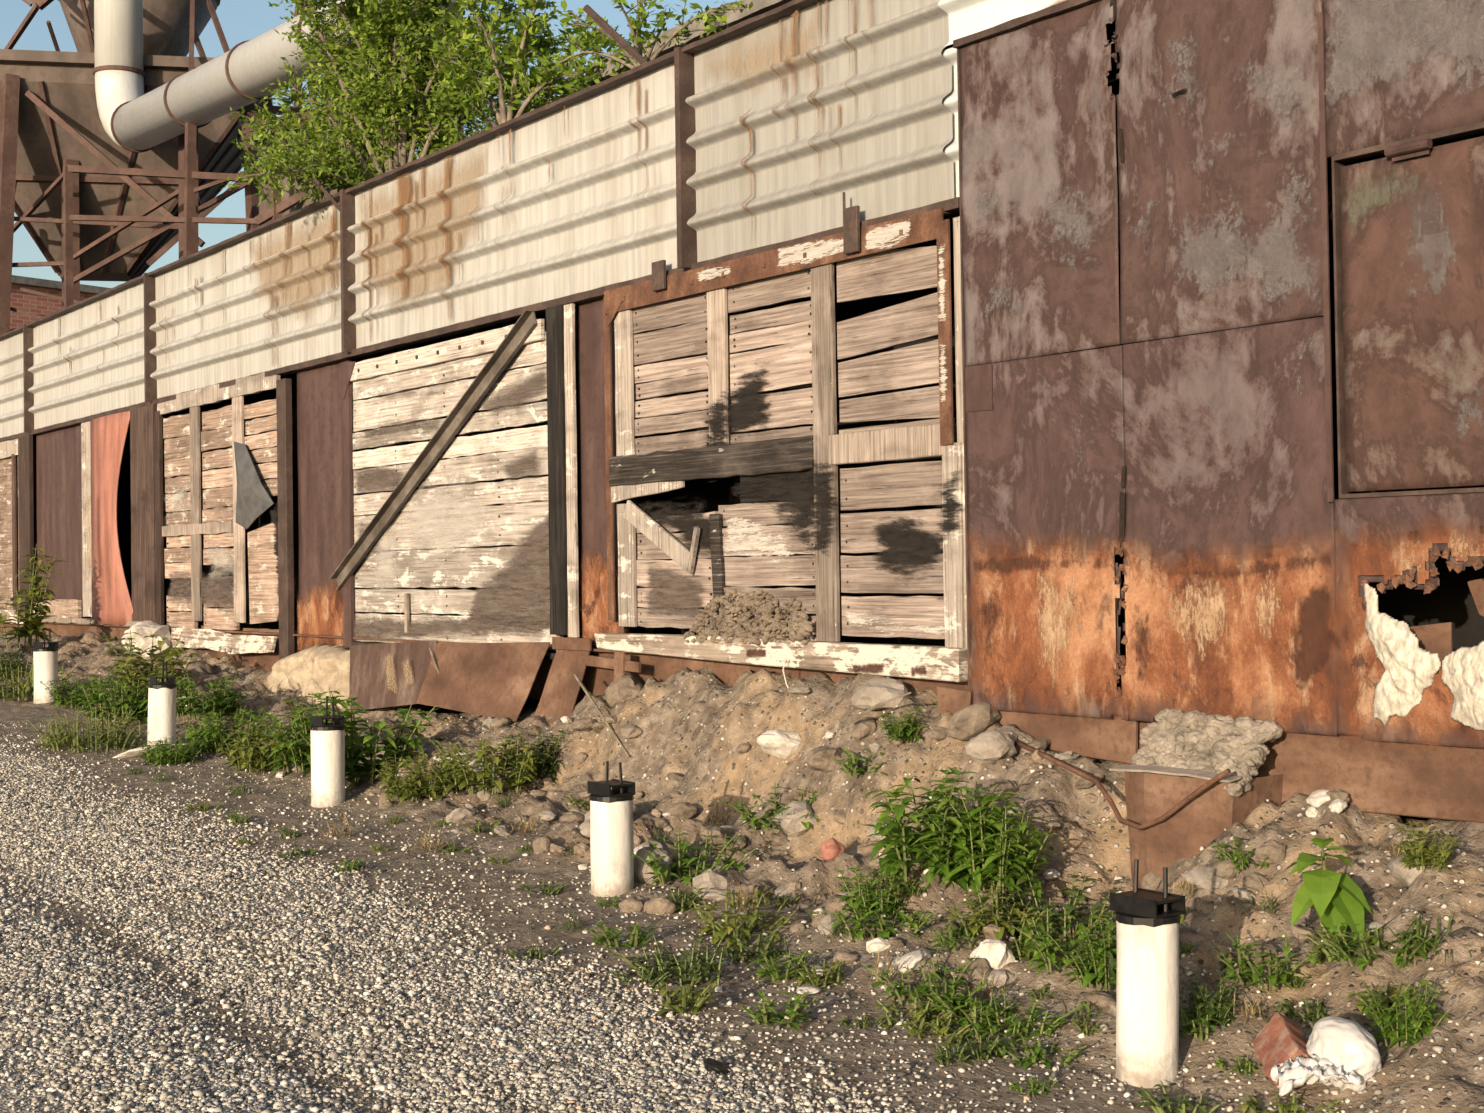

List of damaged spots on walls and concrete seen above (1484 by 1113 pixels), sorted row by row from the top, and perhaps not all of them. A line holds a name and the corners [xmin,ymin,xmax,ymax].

peeling [1326,0,1484,111]
corrosion [629,82,647,165]
corrosion [360,157,511,319]
peeling [698,266,731,281]
peeling [777,239,843,266]
peeling [865,221,911,250]
peeling [1180,177,1319,301]
corrosion [297,586,344,650]
corrosion [579,556,620,638]
crack [1112,466,1135,709]
corrosion [972,525,1484,741]
peeling [1360,548,1484,612]